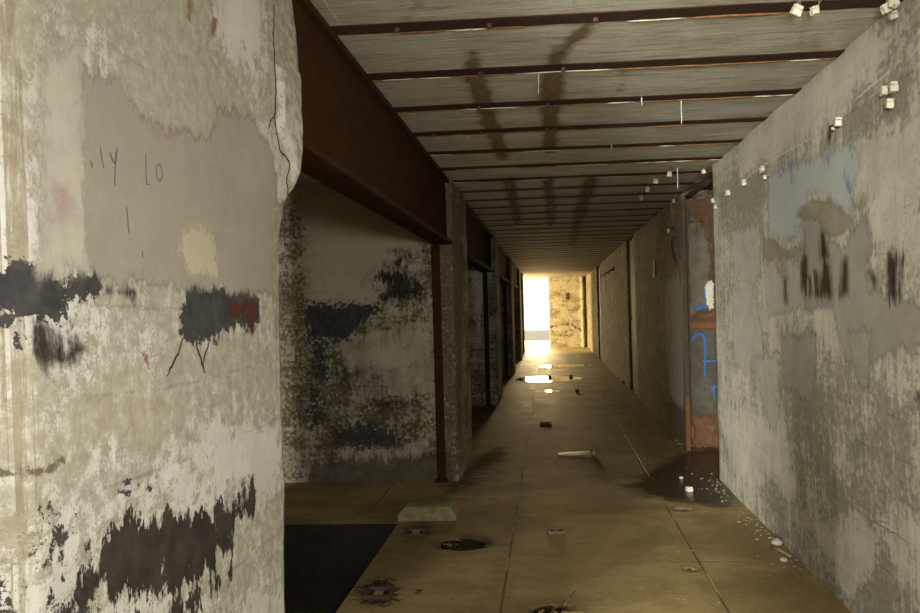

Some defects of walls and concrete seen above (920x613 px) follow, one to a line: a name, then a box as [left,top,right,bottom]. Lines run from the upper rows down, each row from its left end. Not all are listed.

crack [269,5,290,204]
peeling [0,0,260,613]
damp [374,248,426,308]